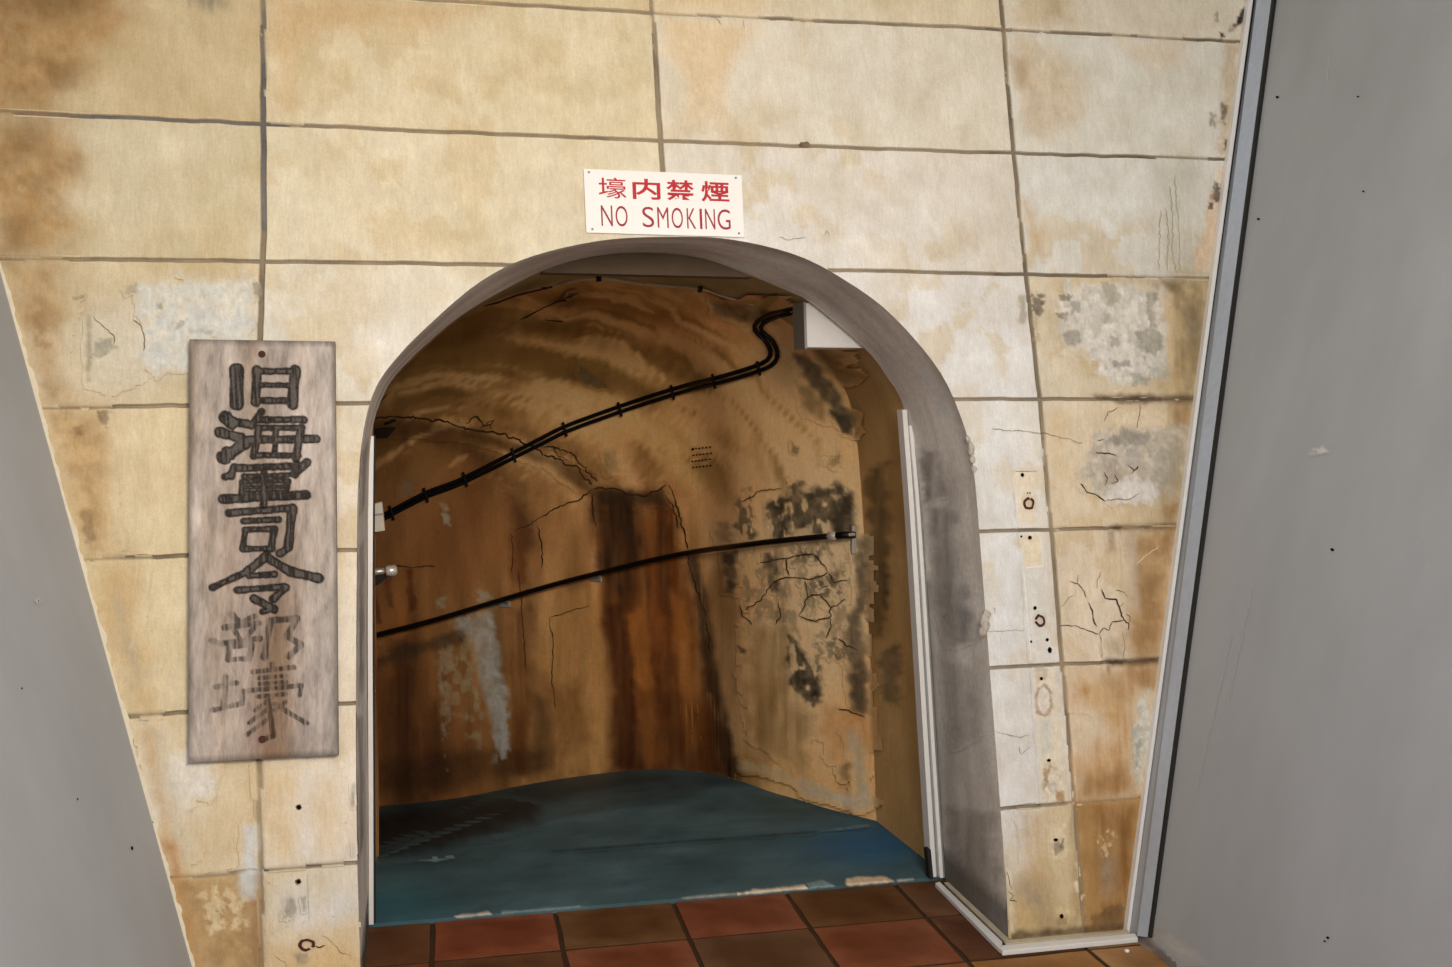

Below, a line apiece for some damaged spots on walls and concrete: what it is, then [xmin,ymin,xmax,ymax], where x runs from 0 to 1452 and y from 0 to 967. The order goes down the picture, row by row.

damp [183,0,500,128]
damp [645,0,815,129]
damp [0,0,166,722]
damp [395,274,553,376]
damp [704,294,797,327]
peeling [1049,276,1162,390]
damp [360,438,369,518]
crack [374,392,688,548]
peeling [1076,407,1173,509]
crack [739,553,857,650]
crack [1061,573,1131,657]
damp [245,581,691,967]